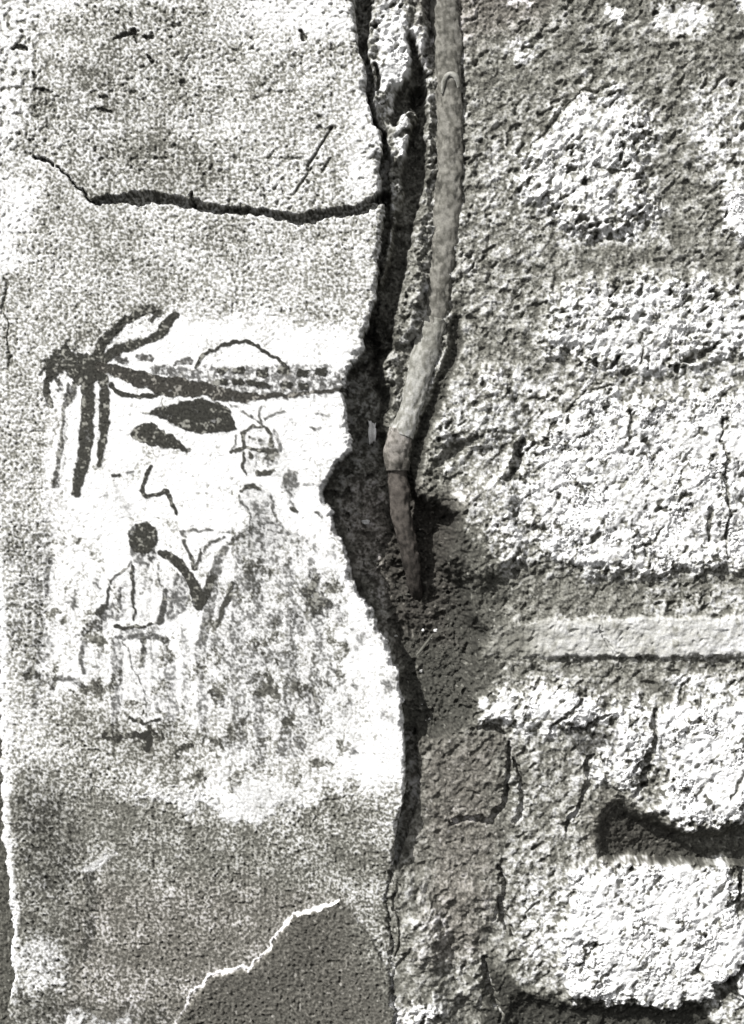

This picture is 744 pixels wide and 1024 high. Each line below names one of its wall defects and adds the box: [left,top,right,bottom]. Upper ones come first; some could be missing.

crack [33,0,489,956]
spalling [175,900,395,1024]